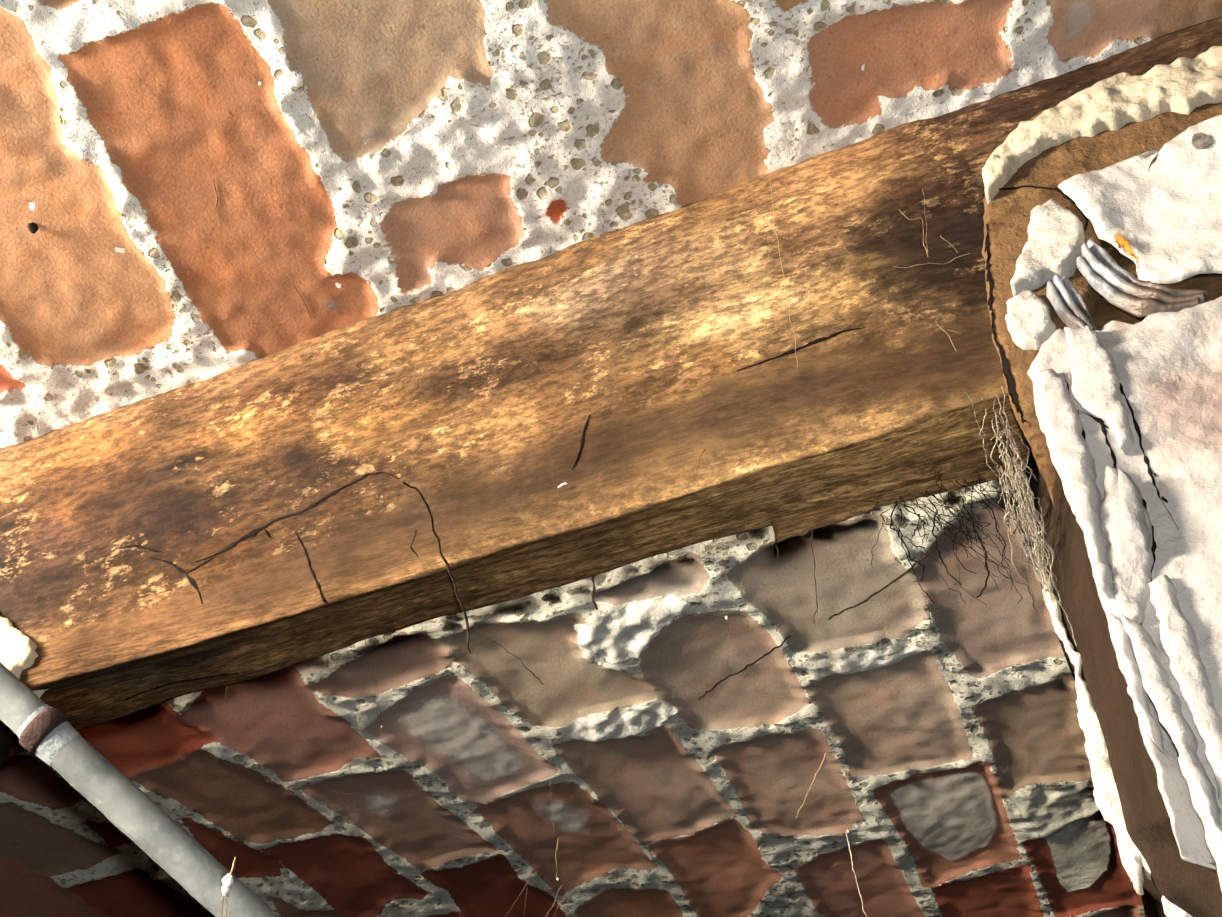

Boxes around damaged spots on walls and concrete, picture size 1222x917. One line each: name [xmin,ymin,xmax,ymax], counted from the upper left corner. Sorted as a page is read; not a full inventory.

crack [983,185,1088,426]
crack [116,471,399,604]
crack [1057,373,1179,626]
water stain [404,698,524,779]